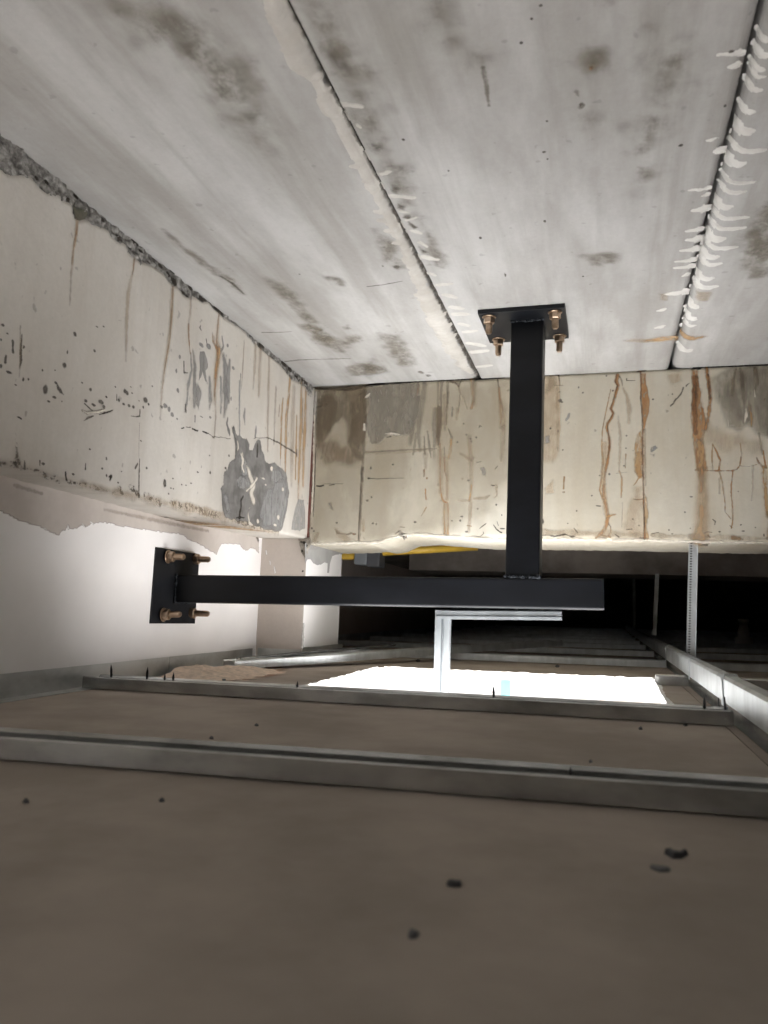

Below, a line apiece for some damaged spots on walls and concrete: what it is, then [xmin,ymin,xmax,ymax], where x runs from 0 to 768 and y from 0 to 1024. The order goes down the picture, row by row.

spalling [0,134,315,397]
peeling [0,325,343,573]
corrosion [280,378,317,538]
water stain [316,364,375,462]
water stain [409,371,453,464]
corrosion [423,378,474,535]
corrosion [595,374,626,538]
corrosion [691,368,741,544]
corrosion [756,450,768,516]